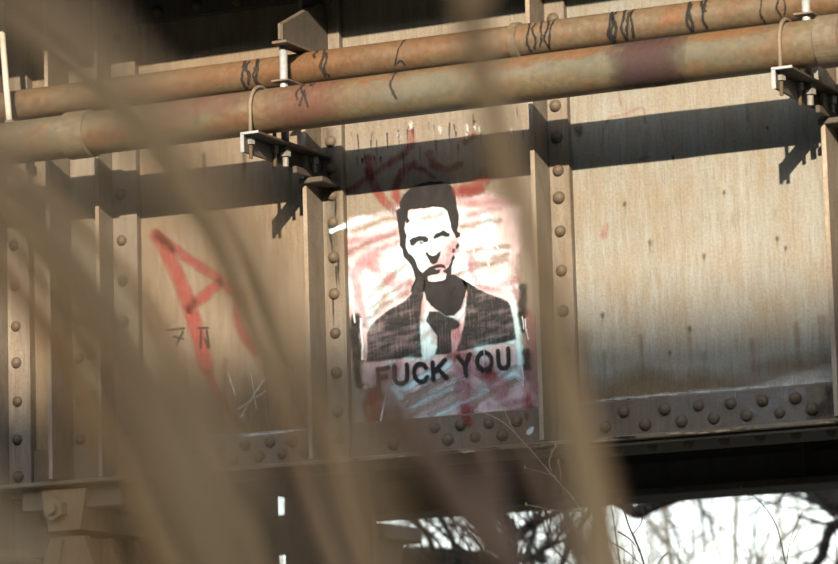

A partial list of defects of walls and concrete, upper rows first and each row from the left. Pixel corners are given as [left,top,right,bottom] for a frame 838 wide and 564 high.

corrosion [617,36,682,88]